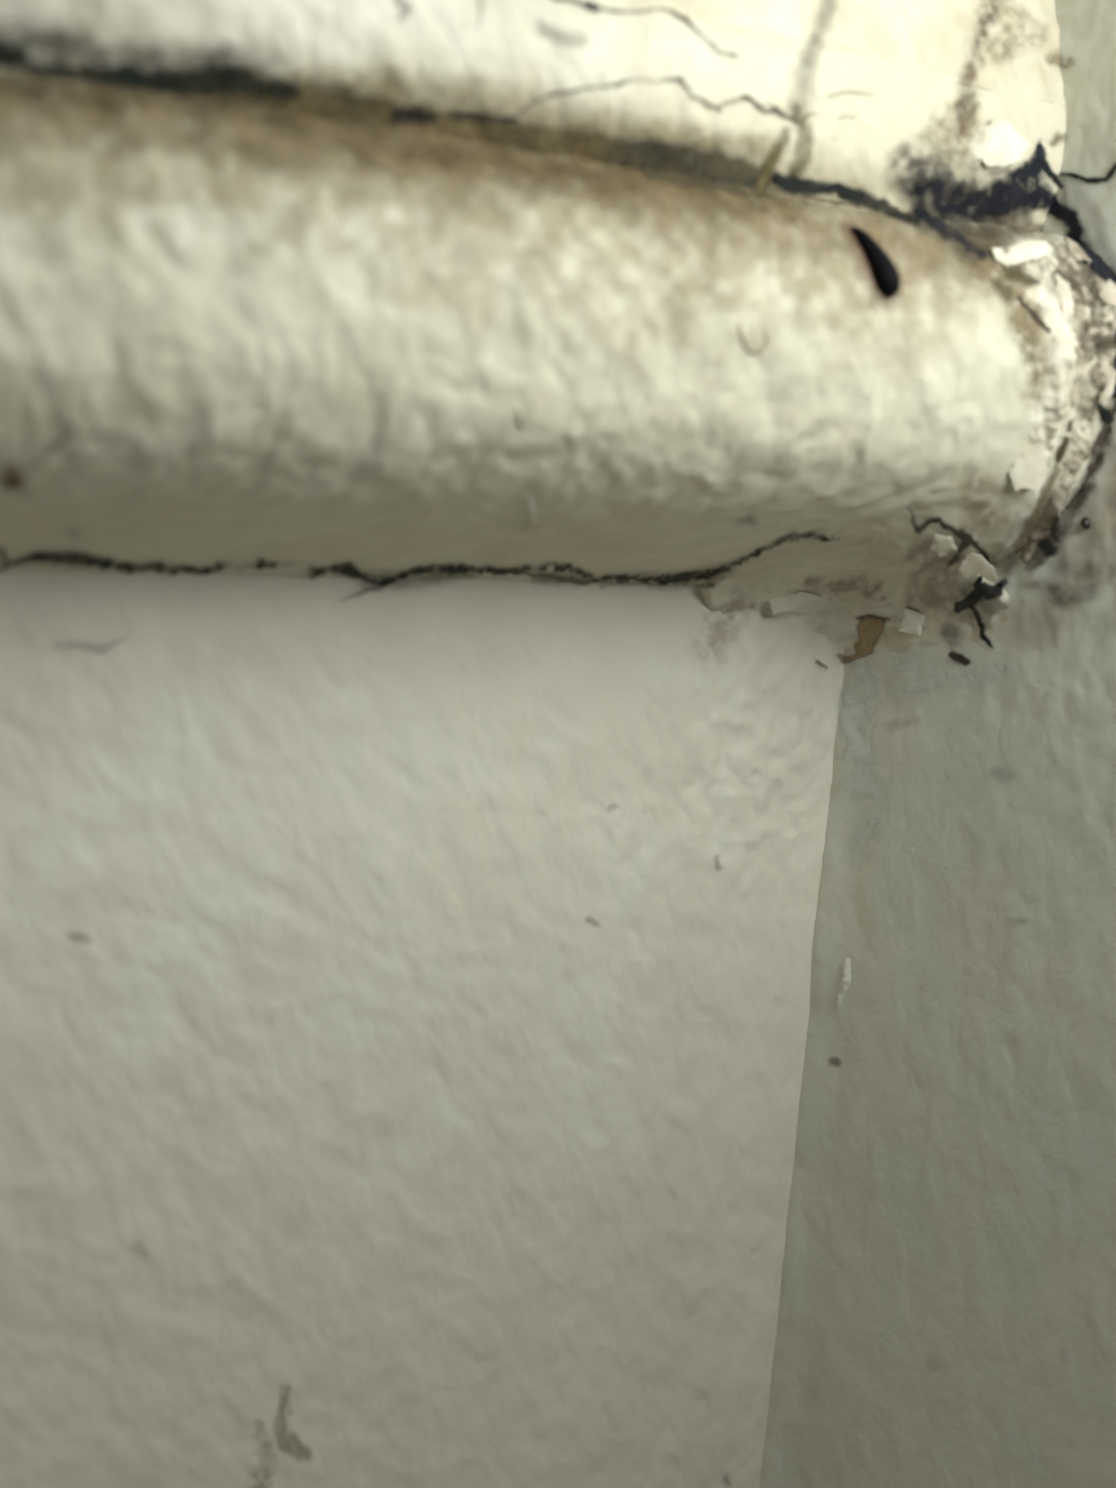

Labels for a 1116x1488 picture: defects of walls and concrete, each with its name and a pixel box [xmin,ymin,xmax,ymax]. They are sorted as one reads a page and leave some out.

crack [555,0,739,57]
crack [524,76,797,123]
water stain [939,0,1010,155]
water stain [1049,54,1072,68]
water stain [0,44,1062,358]
crack [1037,136,1116,285]
crack [1030,335,1116,567]
crack [0,532,839,587]
crack [908,508,990,566]
spalling [930,534,1008,648]
spalling [817,607,926,668]